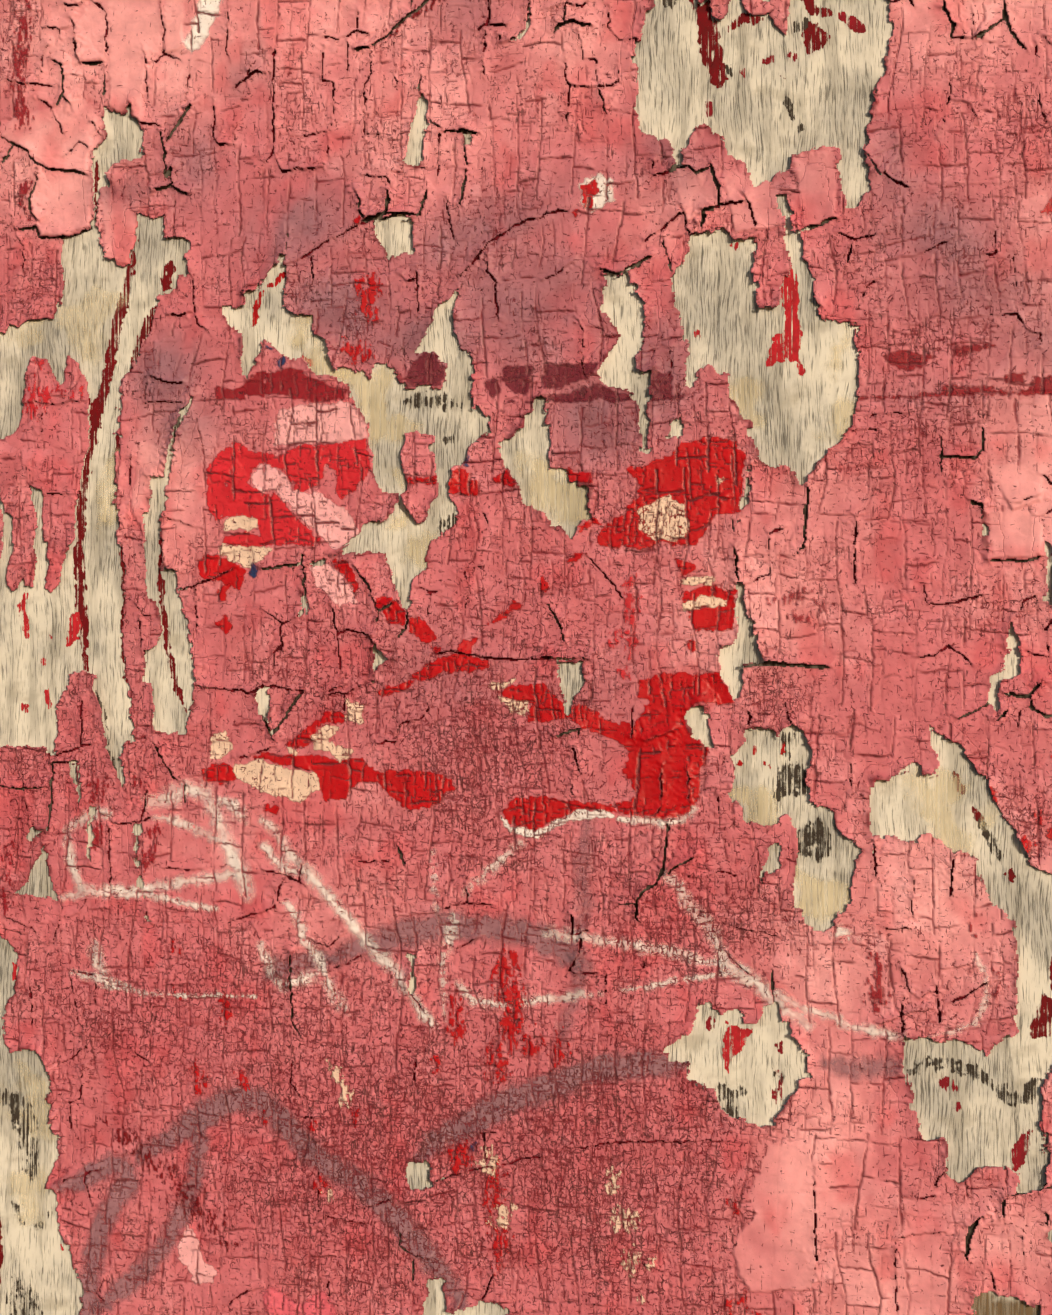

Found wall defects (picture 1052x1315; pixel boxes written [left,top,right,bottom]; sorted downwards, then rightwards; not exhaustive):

crack [1,2,109,292]
crack [140,0,429,195]
crack [285,121,568,319]
crack [477,0,641,120]
crack [600,161,757,278]
peeling [584,0,903,542]
peeling [0,89,320,933]
crack [182,554,481,758]
peeling [222,233,604,763]
peeling [680,571,1052,1255]
peeling [0,922,97,1315]
peeling [651,989,824,1140]